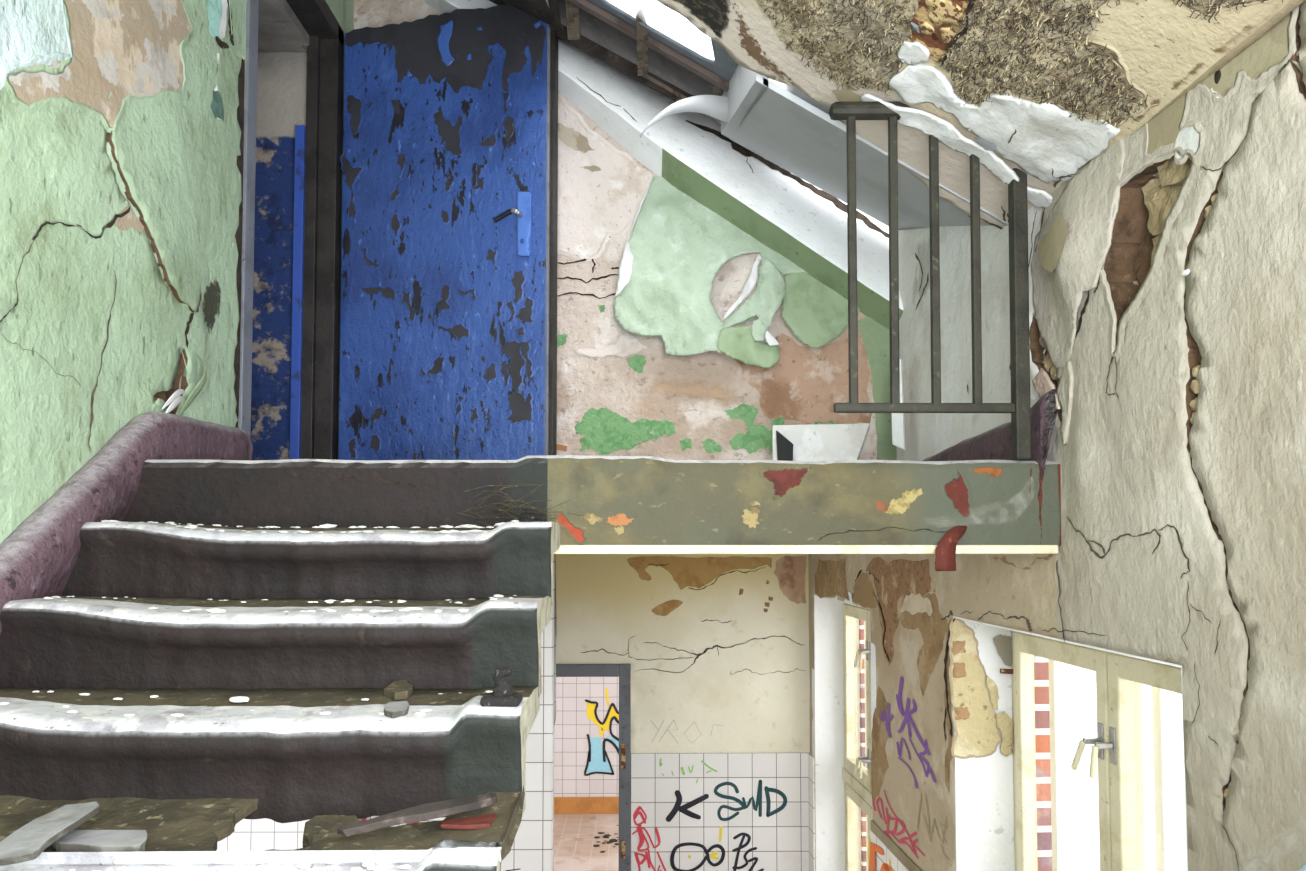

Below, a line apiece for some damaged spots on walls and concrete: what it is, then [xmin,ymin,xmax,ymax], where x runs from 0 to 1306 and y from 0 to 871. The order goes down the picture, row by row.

flaking render [0,0,228,136]
peeling [345,5,546,146]
crack [1255,9,1306,101]
crack [0,130,202,451]
peeling [557,93,872,528]
crack [967,206,1008,229]
flaking render [755,0,1299,399]
flaking render [1029,315,1074,446]
crack [1067,146,1250,871]
crack [581,619,805,675]
spalling [774,466,1014,806]
crack [941,560,1105,742]